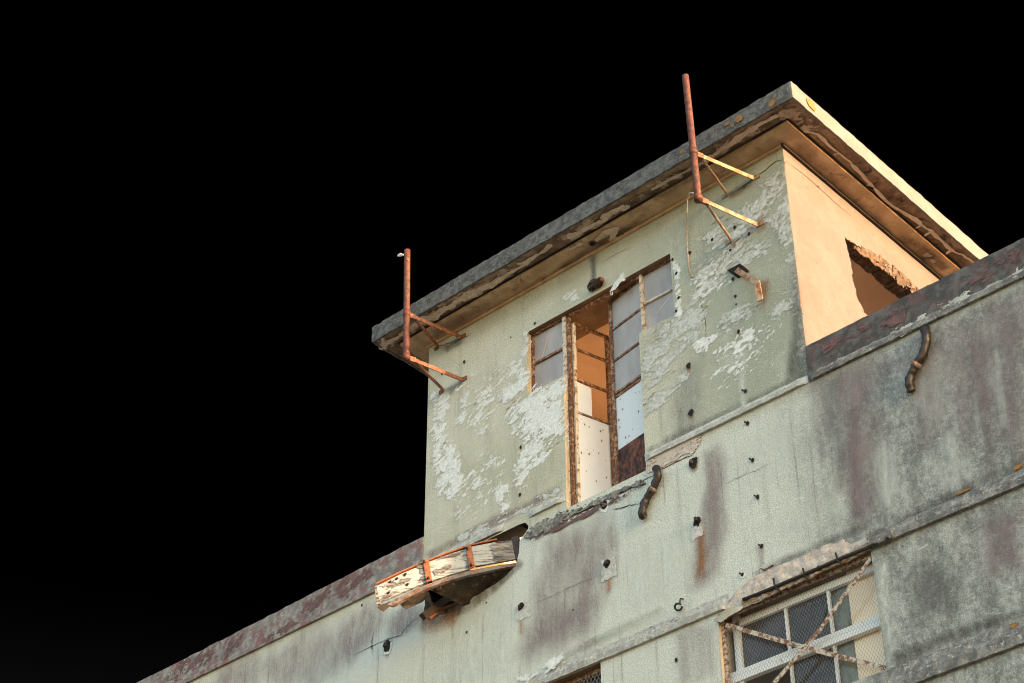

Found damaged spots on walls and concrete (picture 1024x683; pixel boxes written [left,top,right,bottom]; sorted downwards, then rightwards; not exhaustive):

peeling [609,272,626,295]
peeling [640,161,807,418]
spalling [820,240,930,354]
peeling [428,322,569,542]
spalling [524,436,702,539]
spalling [714,527,894,622]